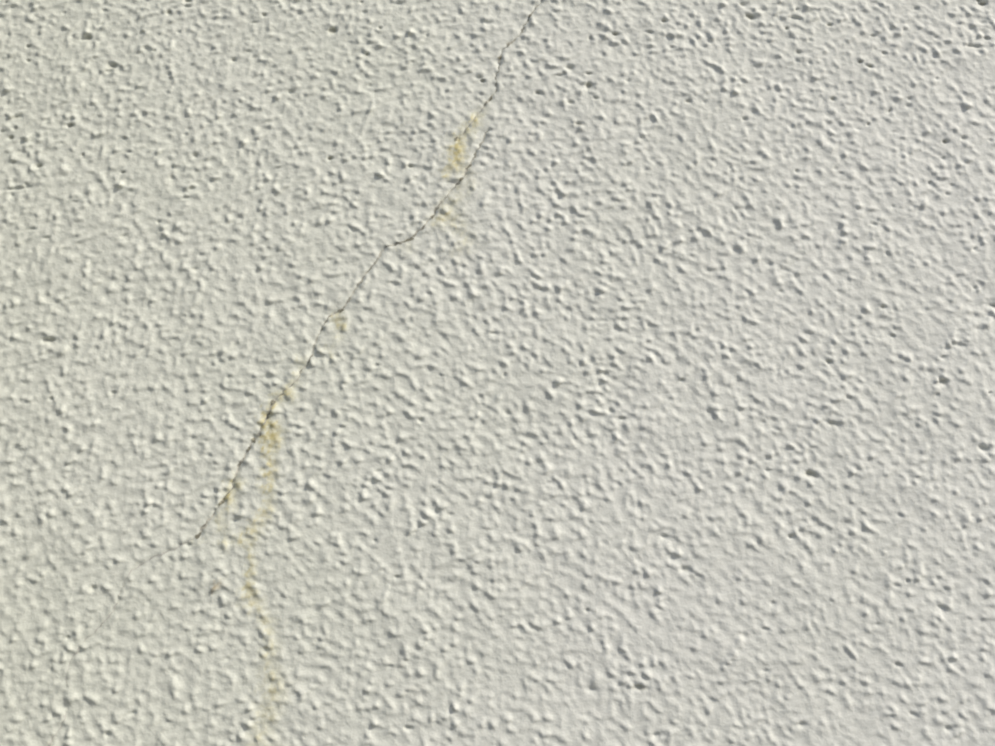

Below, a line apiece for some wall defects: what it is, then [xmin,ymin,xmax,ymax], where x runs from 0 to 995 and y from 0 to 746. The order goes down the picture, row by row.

crack [66,0,542,685]